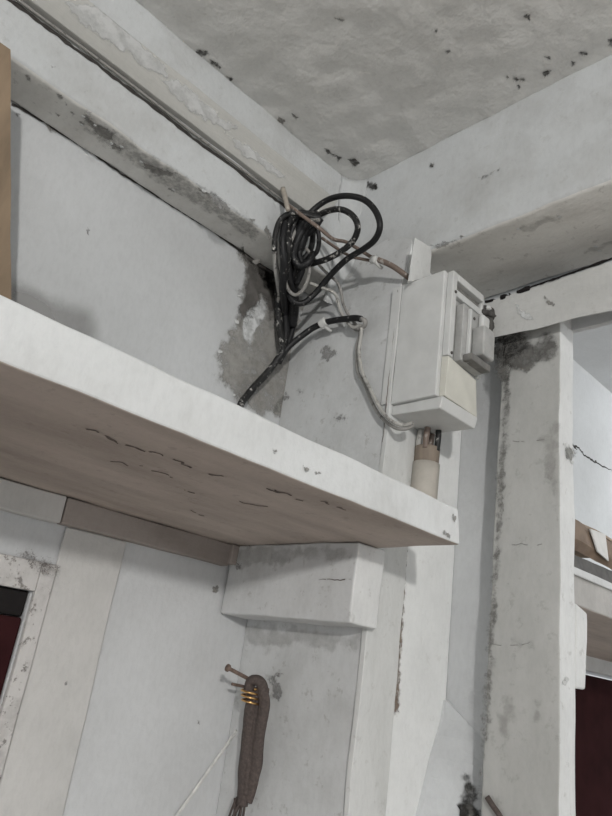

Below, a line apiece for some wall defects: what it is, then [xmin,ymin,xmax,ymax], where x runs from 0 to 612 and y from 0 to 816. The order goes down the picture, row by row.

spalling [57,94,124,150]
spalling [139,161,173,176]
flaking render [217,252,291,417]
crack [86,429,221,478]
crack [573,445,611,470]
crack [239,488,345,510]